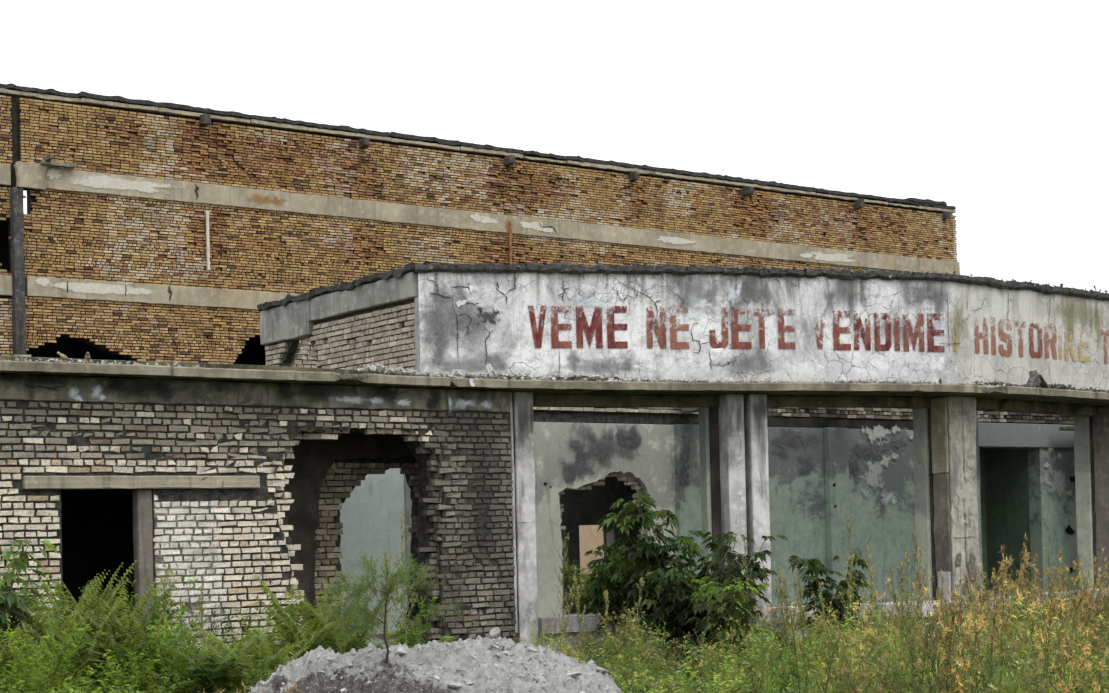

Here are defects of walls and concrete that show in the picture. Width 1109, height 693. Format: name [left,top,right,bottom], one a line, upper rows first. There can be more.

crack [428,276,516,363]
peeling [849,425,913,505]